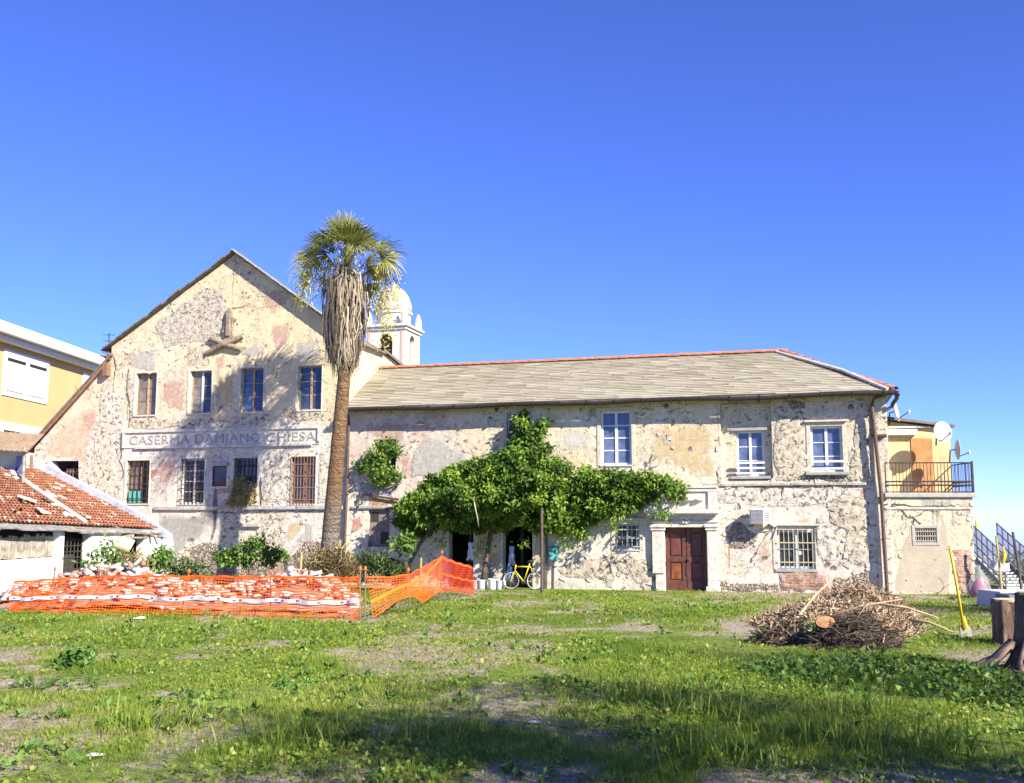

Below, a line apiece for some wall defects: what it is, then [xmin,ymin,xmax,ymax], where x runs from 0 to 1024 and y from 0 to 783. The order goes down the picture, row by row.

flaking render [155,286,238,356]
flaking render [643,401,874,593]
flaking render [554,552,656,589]